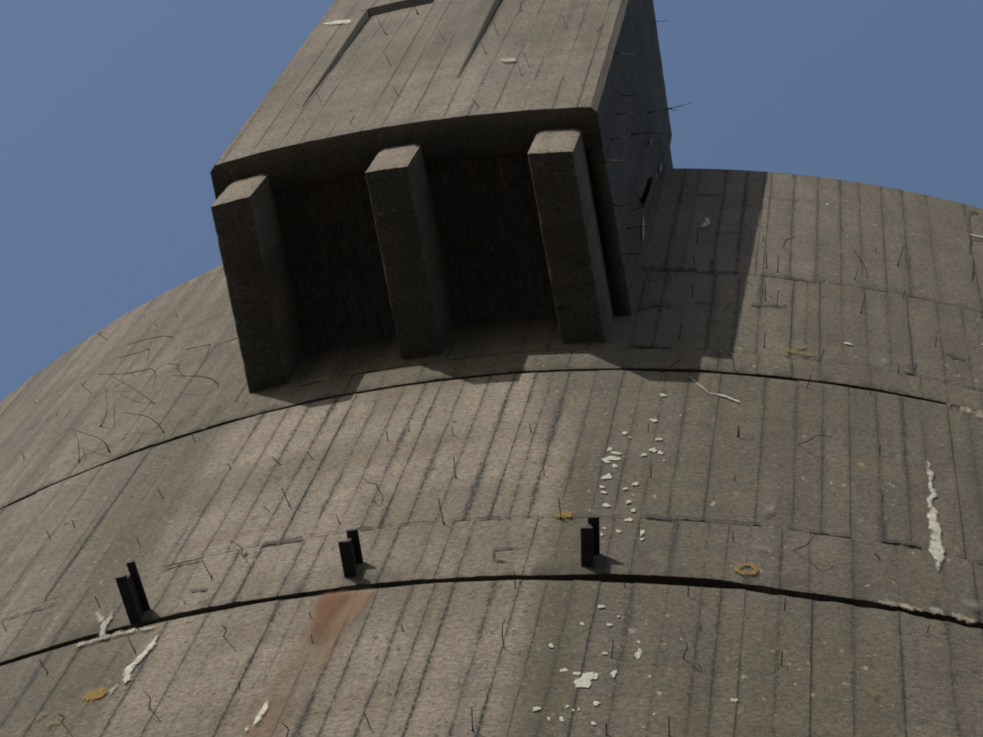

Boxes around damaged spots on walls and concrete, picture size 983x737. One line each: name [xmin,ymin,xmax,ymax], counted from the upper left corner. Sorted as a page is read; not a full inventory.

crack [360,515,535,529]
damp [926,461,945,570]
crack [243,533,319,555]
rust [319,591,369,626]